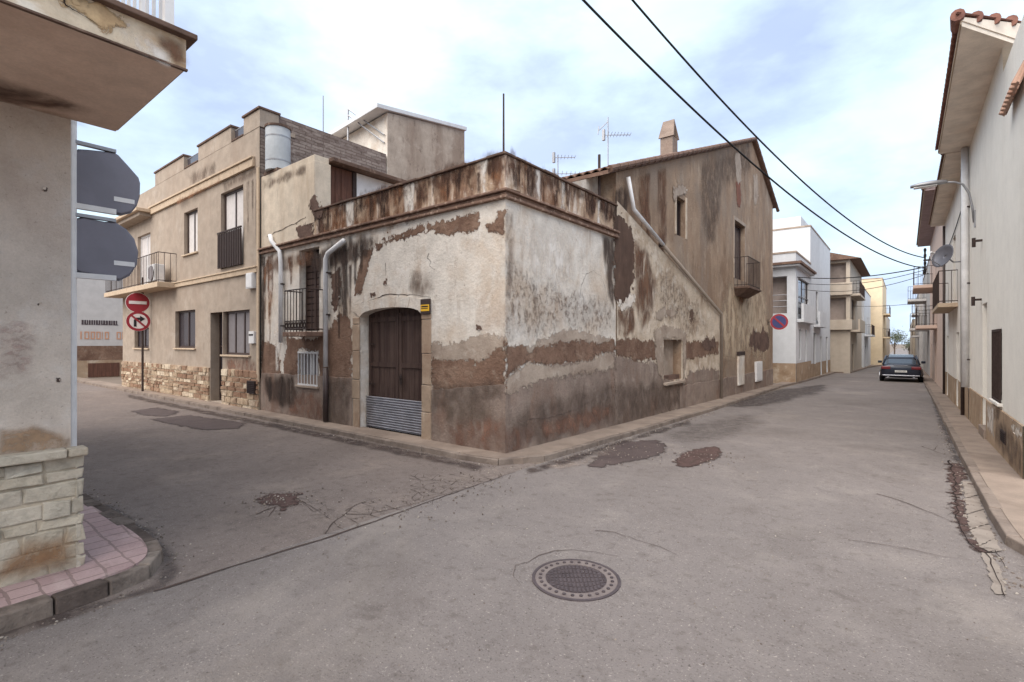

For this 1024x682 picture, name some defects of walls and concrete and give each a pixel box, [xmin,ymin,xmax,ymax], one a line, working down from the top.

flaking render [58,0,130,34]
flaking render [354,209,508,298]
leakage [327,150,698,335]
flaking render [431,307,719,390]
flaking render [749,326,769,353]